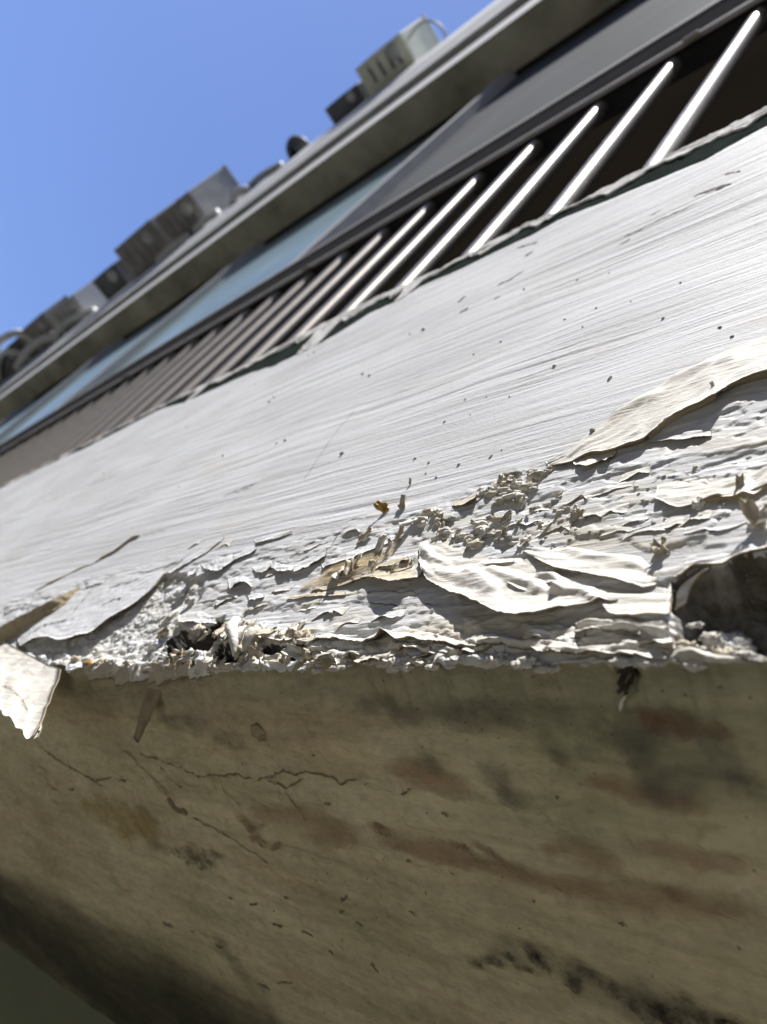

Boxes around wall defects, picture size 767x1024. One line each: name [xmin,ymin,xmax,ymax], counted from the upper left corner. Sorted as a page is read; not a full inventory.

peeling [0,336,767,743]
crack [33,738,112,786]
crack [123,742,371,863]